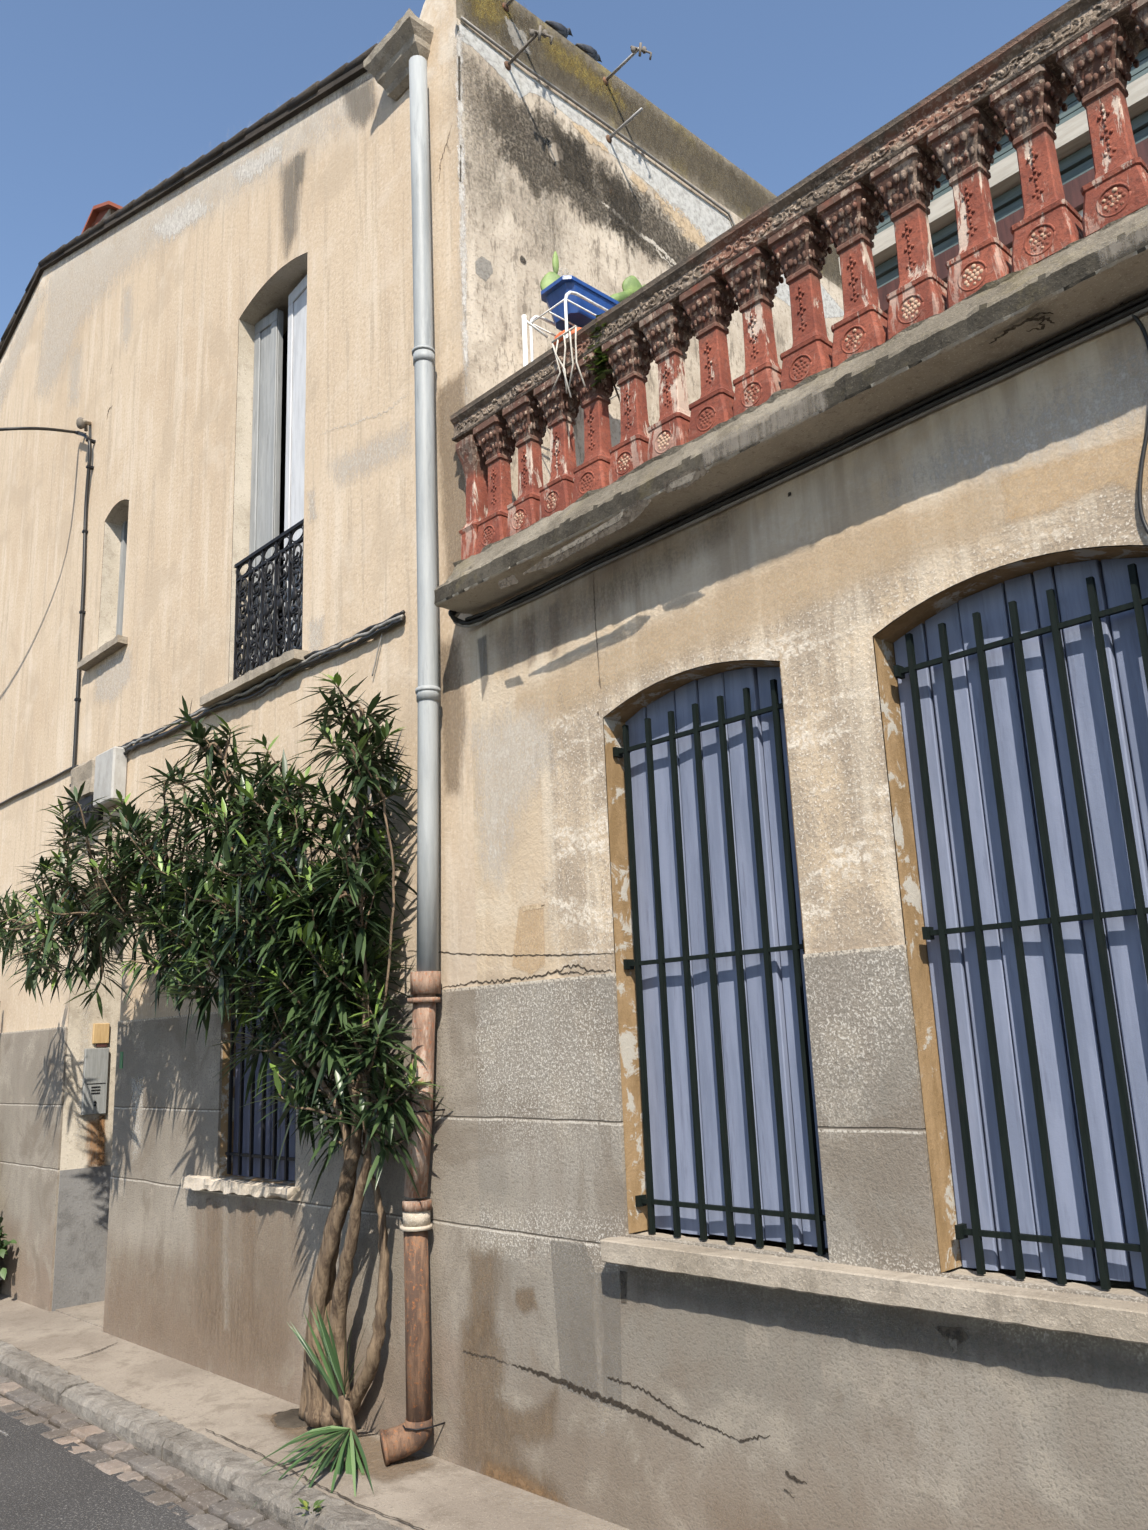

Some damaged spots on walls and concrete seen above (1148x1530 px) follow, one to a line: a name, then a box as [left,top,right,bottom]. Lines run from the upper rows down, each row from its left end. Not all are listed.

leakage [486,75,696,267]
peeling [630,173,709,248]
peeling [1001,433,1148,519]
crack [463,1350,770,1448]
crack [784,1470,807,1498]